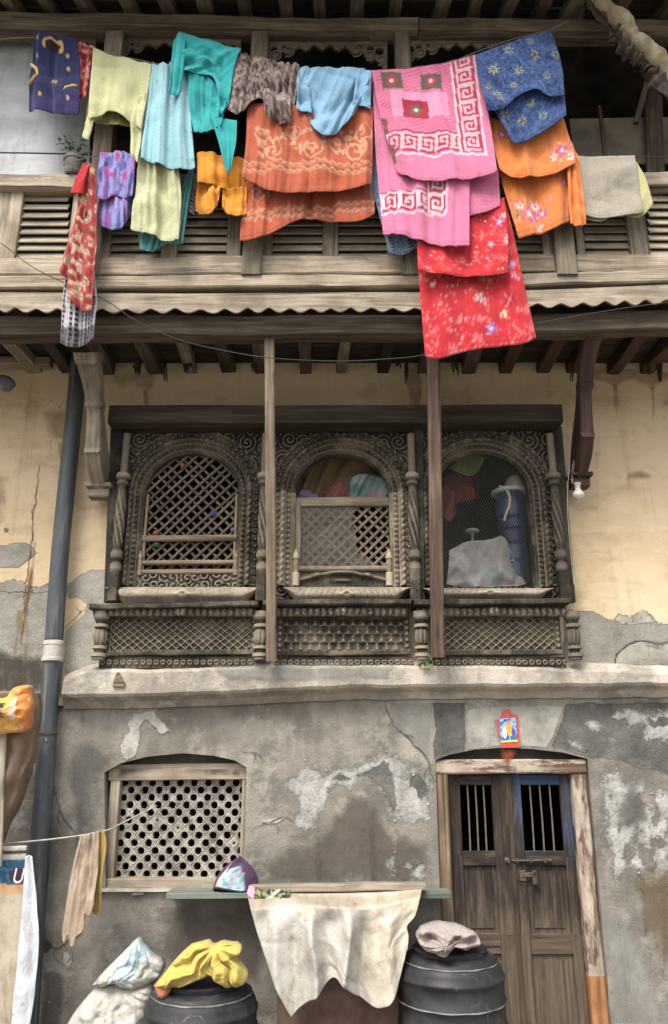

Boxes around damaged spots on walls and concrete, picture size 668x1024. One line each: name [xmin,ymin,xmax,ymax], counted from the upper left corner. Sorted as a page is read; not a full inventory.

crack [6,465,48,614]
peeling [0,528,48,666]
peeling [59,570,105,696]
peeling [563,609,668,663]
peeling [120,708,171,761]
crack [385,701,435,791]
peeling [584,708,668,744]
peeling [262,750,434,836]
peeling [597,767,668,902]